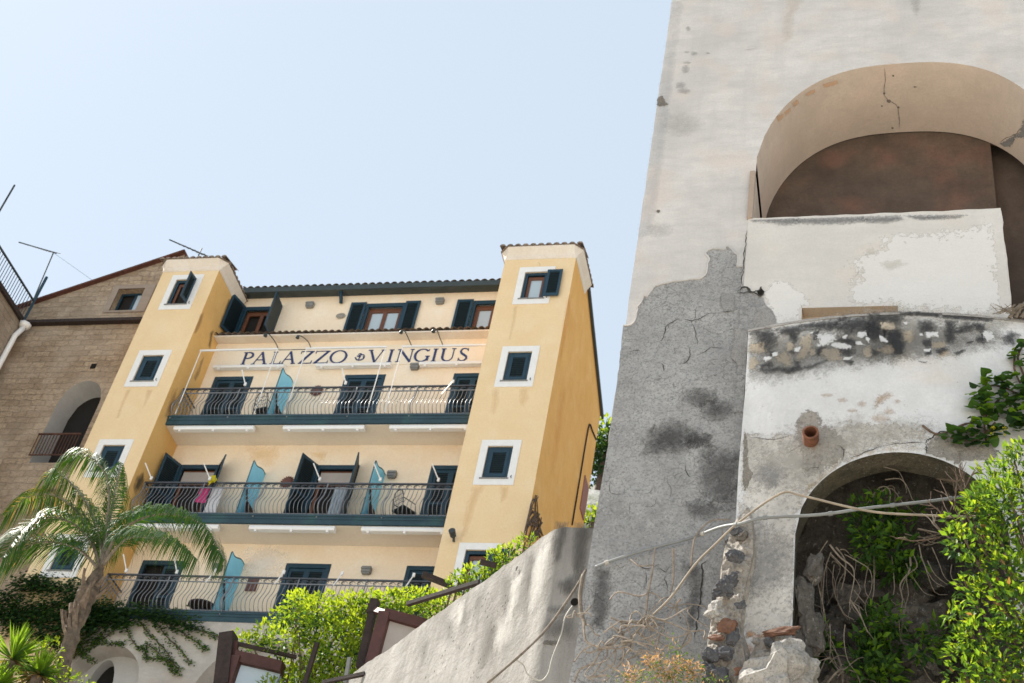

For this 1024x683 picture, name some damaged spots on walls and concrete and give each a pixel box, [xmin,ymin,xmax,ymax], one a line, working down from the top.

crack [630,310,717,370]
leakage [650,426,709,450]
flaking render [568,246,999,683]